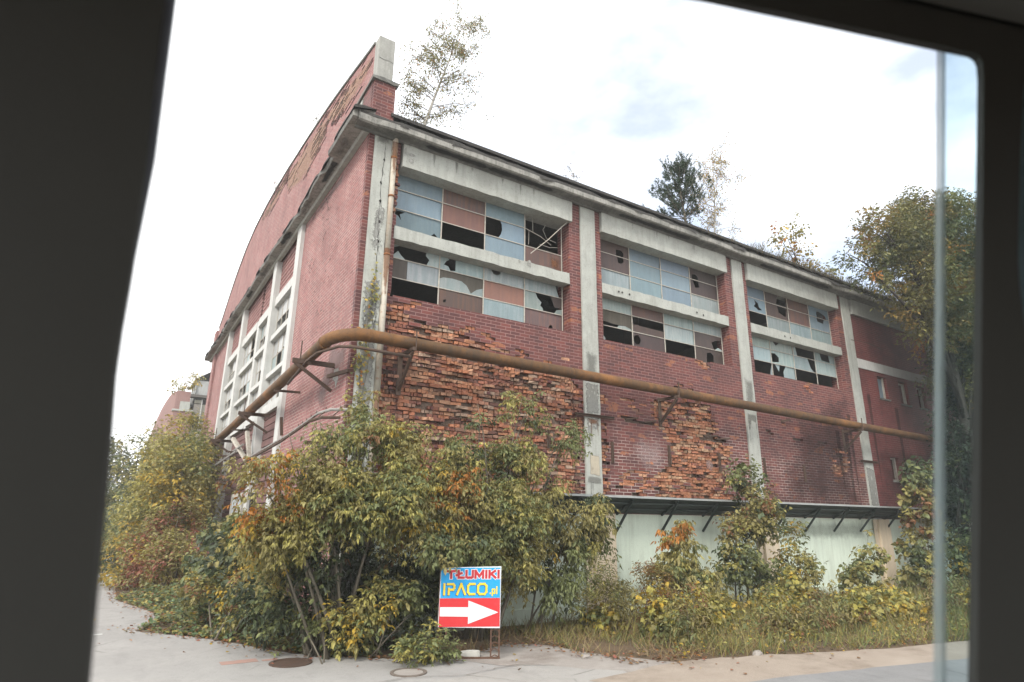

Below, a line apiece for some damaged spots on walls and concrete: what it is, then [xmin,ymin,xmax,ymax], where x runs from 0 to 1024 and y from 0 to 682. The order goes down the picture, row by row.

spalling [262,57,374,220]
spalling [352,281,736,500]